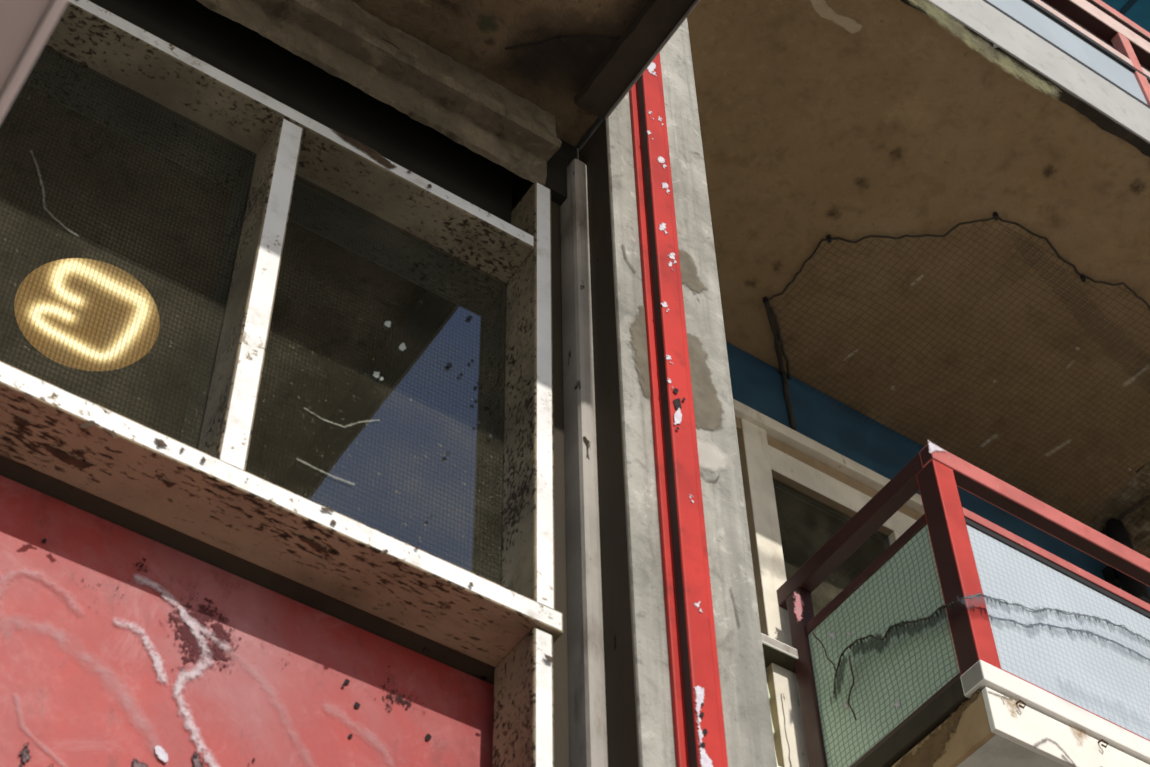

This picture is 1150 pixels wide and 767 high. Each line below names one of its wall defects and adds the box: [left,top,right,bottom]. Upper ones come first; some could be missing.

peeling [928,440,947,453]
spalling [1087,459,1150,557]
peeling [694,686,713,767]
peeling [18,742,31,767]
peeling [131,745,169,767]
peeling [192,752,204,767]